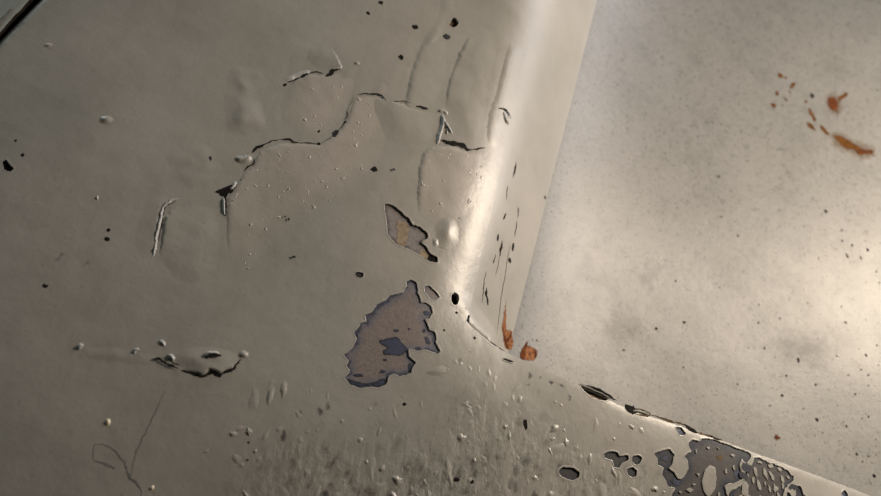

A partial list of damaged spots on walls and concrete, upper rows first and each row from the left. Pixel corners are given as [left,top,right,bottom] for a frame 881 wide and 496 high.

rust [828,93,848,113]
rust [805,100,874,155]
peeling [382,202,440,265]
crack [133,340,242,378]
peeling [342,278,459,391]
rust [502,307,537,361]
crack [93,392,165,496]
peeling [557,465,581,482]
peeling [602,426,808,496]